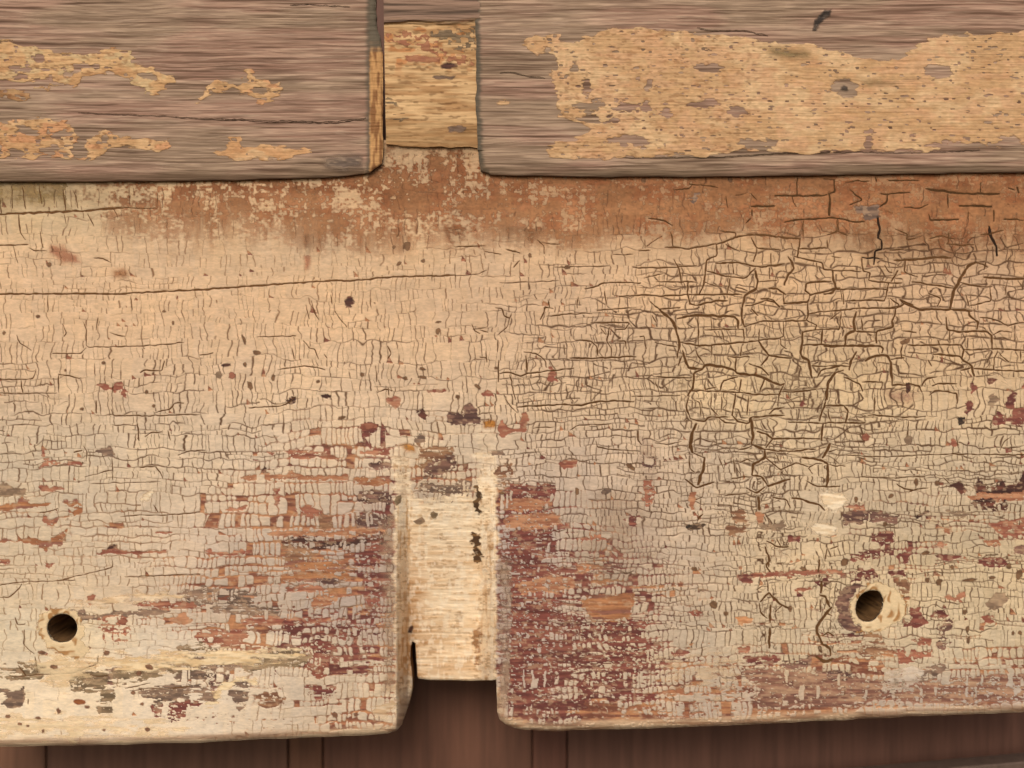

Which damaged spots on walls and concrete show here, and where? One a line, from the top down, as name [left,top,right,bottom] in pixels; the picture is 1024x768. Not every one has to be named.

peeling [0,117,172,161]
peeling [0,39,176,102]
peeling [522,27,1024,161]
crack [0,150,1024,521]
peeling [0,650,57,733]
crack [0,561,194,691]
peeling [69,423,401,731]
peeling [492,451,591,707]
peeling [572,594,652,702]
crack [757,539,788,648]
crack [815,546,838,663]
peeling [726,472,1024,708]